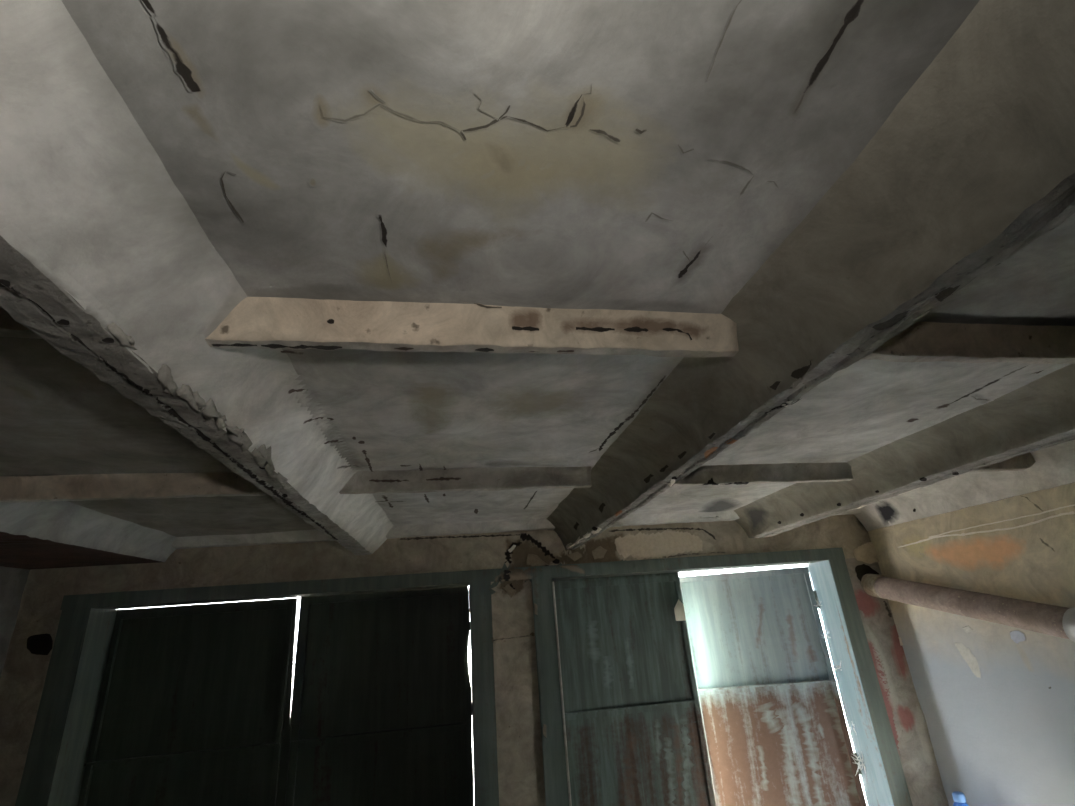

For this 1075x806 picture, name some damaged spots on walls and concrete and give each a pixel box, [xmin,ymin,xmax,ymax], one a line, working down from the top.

crack [309,81,648,179]
crack [220,170,245,223]
crack [677,144,780,199]
crack [369,215,410,295]
crack [665,233,718,292]
spalling [0,224,288,489]
crack [0,278,338,540]
spalling [768,358,814,391]
flaking render [488,527,727,617]